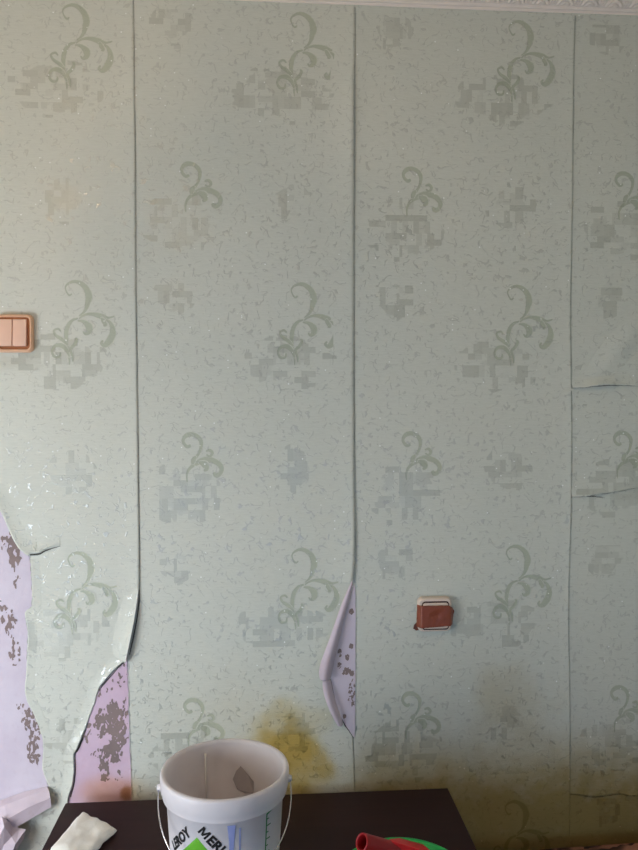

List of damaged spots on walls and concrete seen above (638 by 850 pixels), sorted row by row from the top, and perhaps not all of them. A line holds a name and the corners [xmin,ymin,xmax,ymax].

flaking render [68,660,131,803]
flaking render [331,585,356,737]